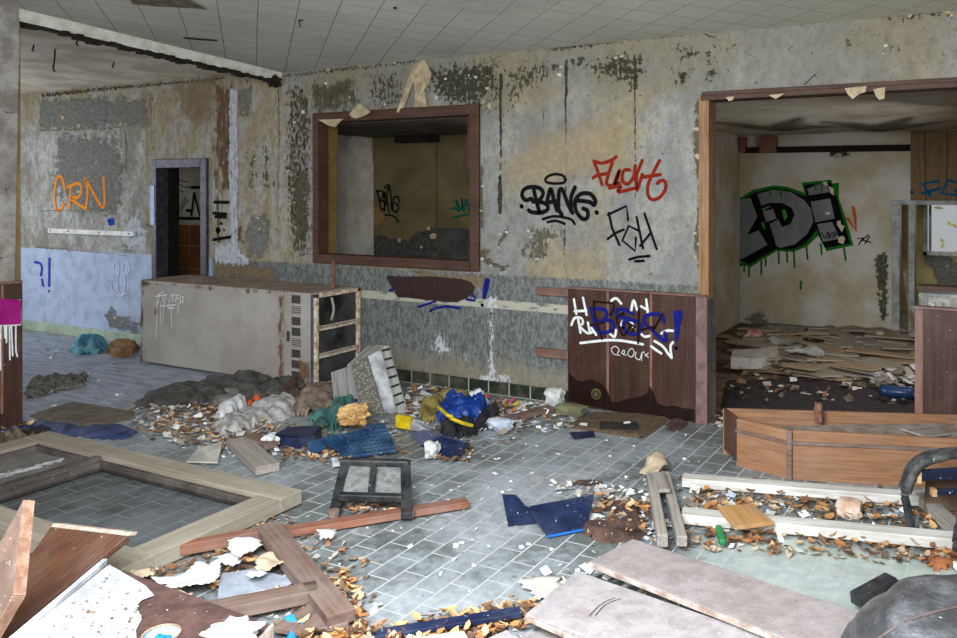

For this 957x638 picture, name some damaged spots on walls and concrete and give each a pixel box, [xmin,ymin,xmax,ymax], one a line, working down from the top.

peeling [38,76,224,217]
spalling [118,215,148,254]
peeling [215,88,270,267]
peeling [291,164,313,256]
damp [716,118,948,132]
peeling [874,252,890,323]
peeling [923,255,957,307]